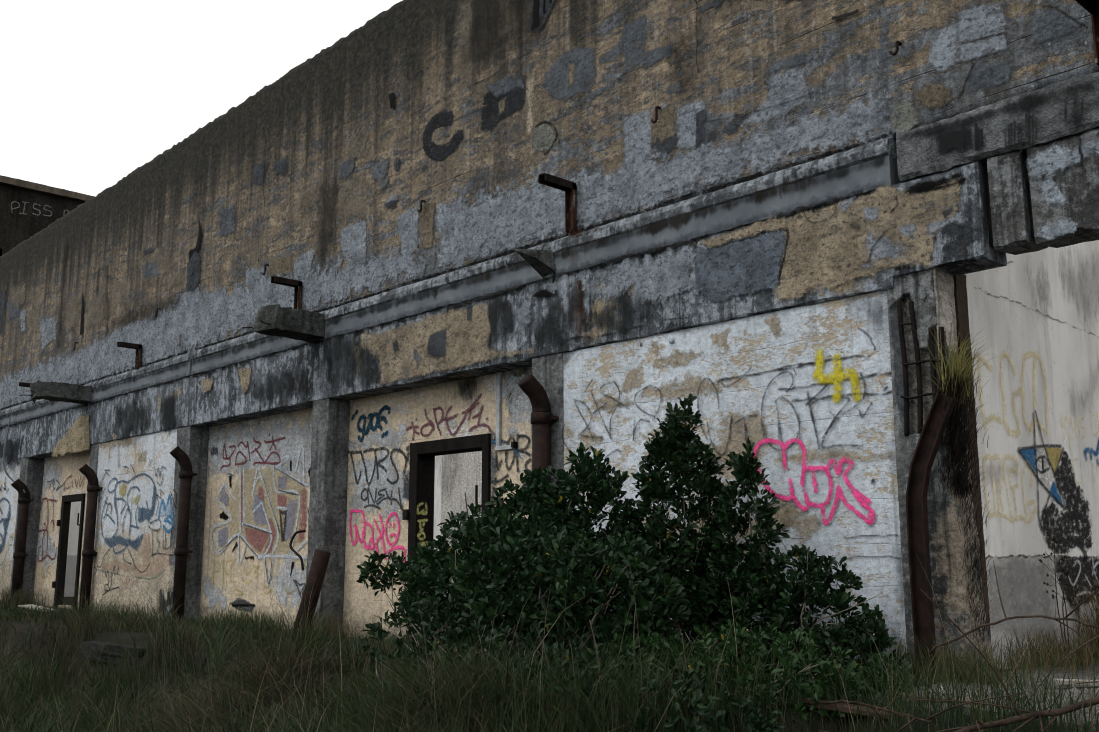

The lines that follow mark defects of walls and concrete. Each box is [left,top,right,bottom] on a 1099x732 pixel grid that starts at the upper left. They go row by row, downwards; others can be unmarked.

peeling [0,154,425,411]
peeling [0,287,533,503]
water stain [553,237,615,275]
water stain [530,289,655,363]
peeling [582,339,720,419]
water stain [627,202,758,253]
peeling [435,0,1011,270]
peeling [567,173,966,308]
water stain [749,154,884,201]
spalling [895,297,951,436]
crack [979,271,1095,335]
peeling [346,419,410,524]